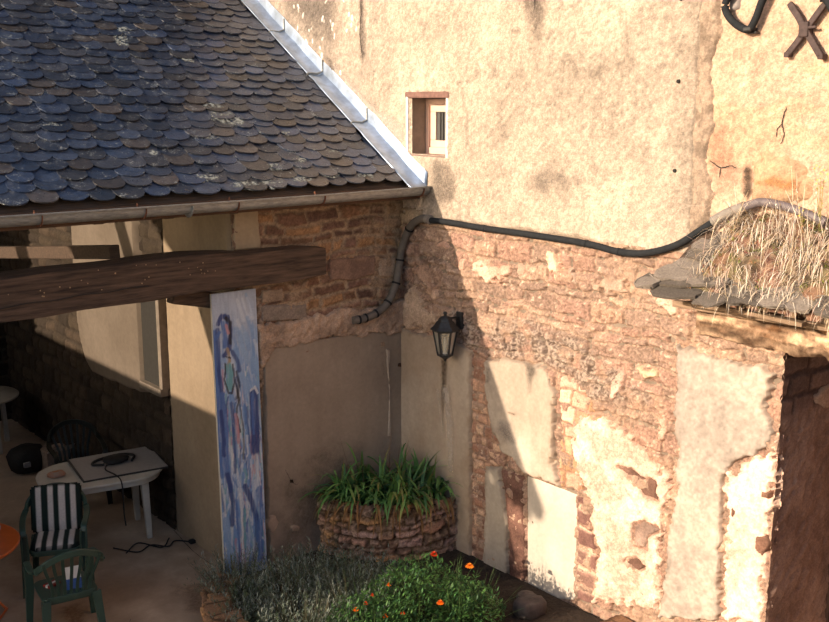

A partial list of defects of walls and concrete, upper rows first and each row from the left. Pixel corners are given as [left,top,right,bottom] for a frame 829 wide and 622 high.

crack [776,108,787,144]
flaking render [231,200,787,622]